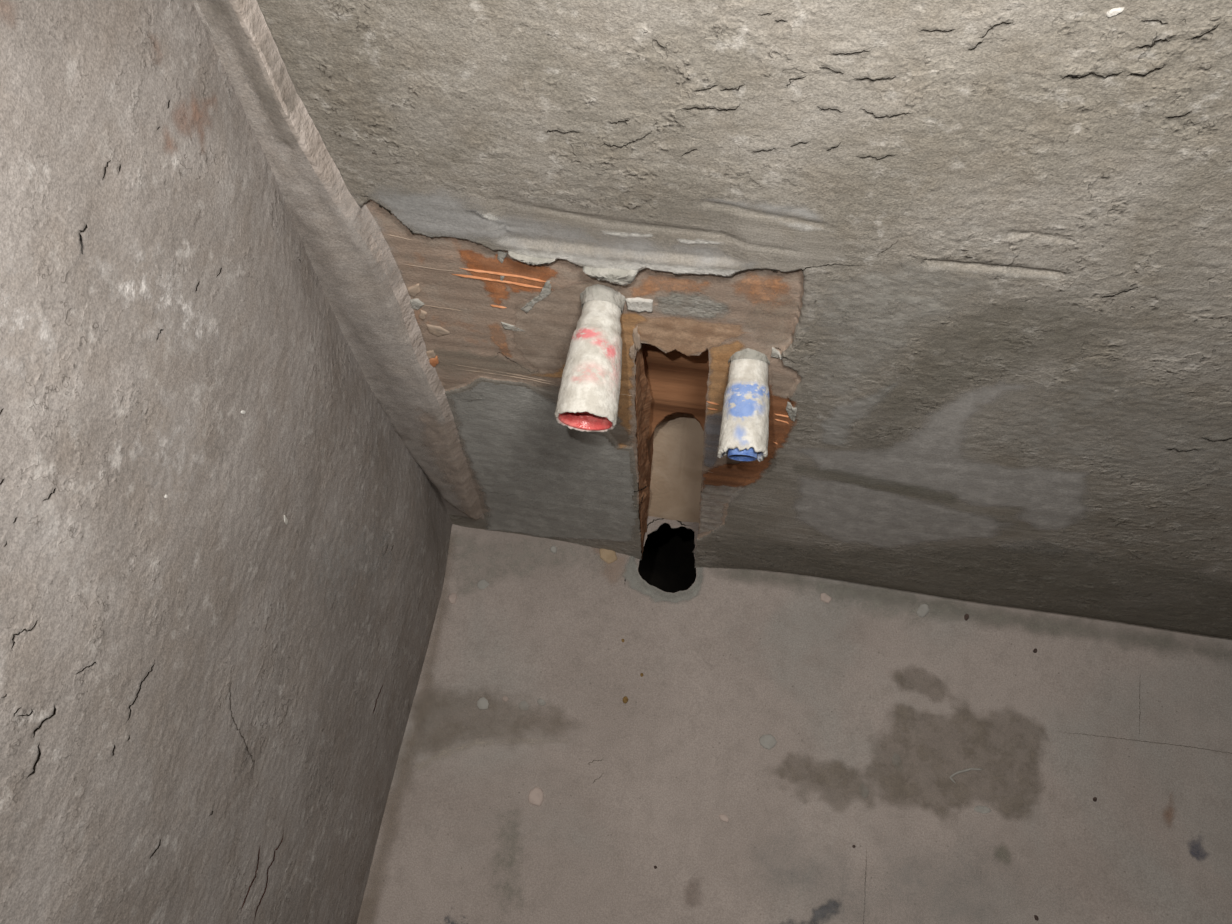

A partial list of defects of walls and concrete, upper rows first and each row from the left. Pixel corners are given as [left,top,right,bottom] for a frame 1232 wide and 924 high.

crack [918,22,1010,50]
crack [1062,20,1218,79]
crack [787,50,897,87]
crack [682,84,745,111]
crack [816,106,912,118]
crack [547,119,646,147]
crack [753,142,893,160]
spalling [229,0,804,540]
crack [12,620,38,651]
crack [4,694,56,778]
leakage [780,706,1043,816]
leakage [810,901,839,924]